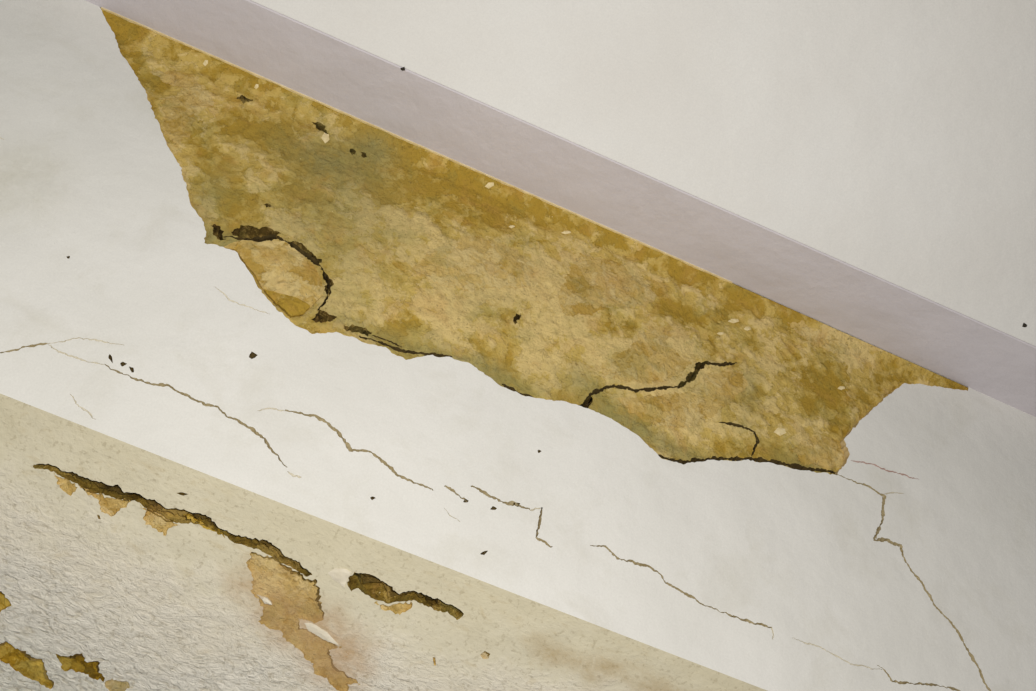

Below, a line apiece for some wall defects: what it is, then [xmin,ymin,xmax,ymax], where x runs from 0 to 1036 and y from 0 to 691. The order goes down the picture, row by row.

spalling [100,7,968,475]
crack [0,337,552,548]
peeling [0,591,11,612]
peeling [0,641,54,689]
peeling [33,464,360,691]
spalling [328,568,464,620]
crack [590,460,991,691]